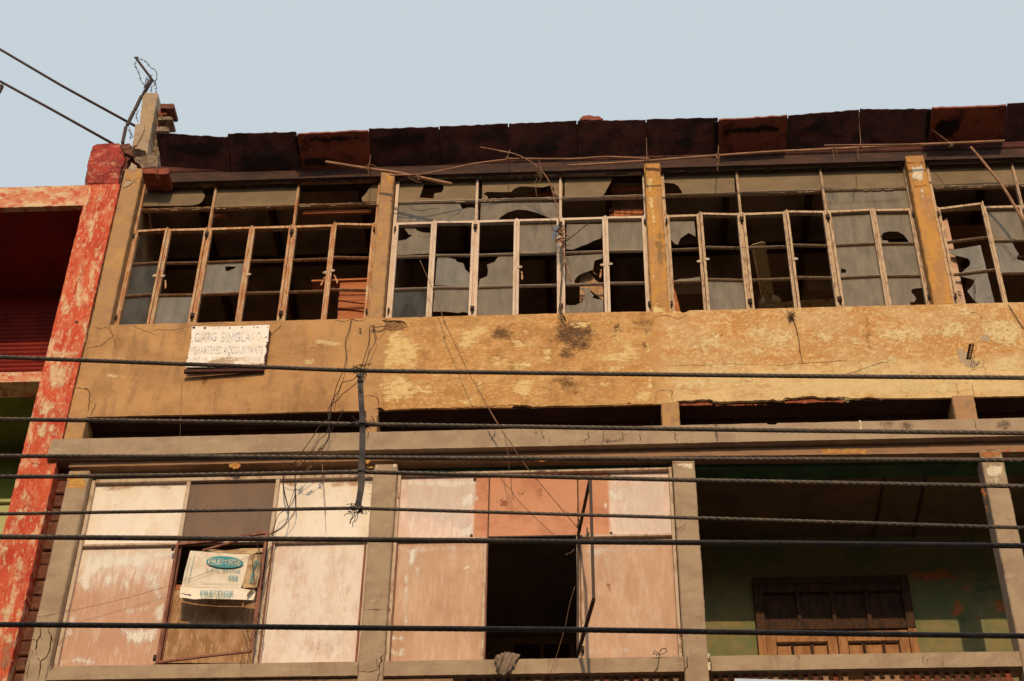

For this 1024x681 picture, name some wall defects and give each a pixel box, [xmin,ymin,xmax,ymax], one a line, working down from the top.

peeling [35,275,96,438]
crack [65,220,219,430]
water stain [534,316,595,394]
peeling [66,471,85,489]
flaking render [0,608,17,680]